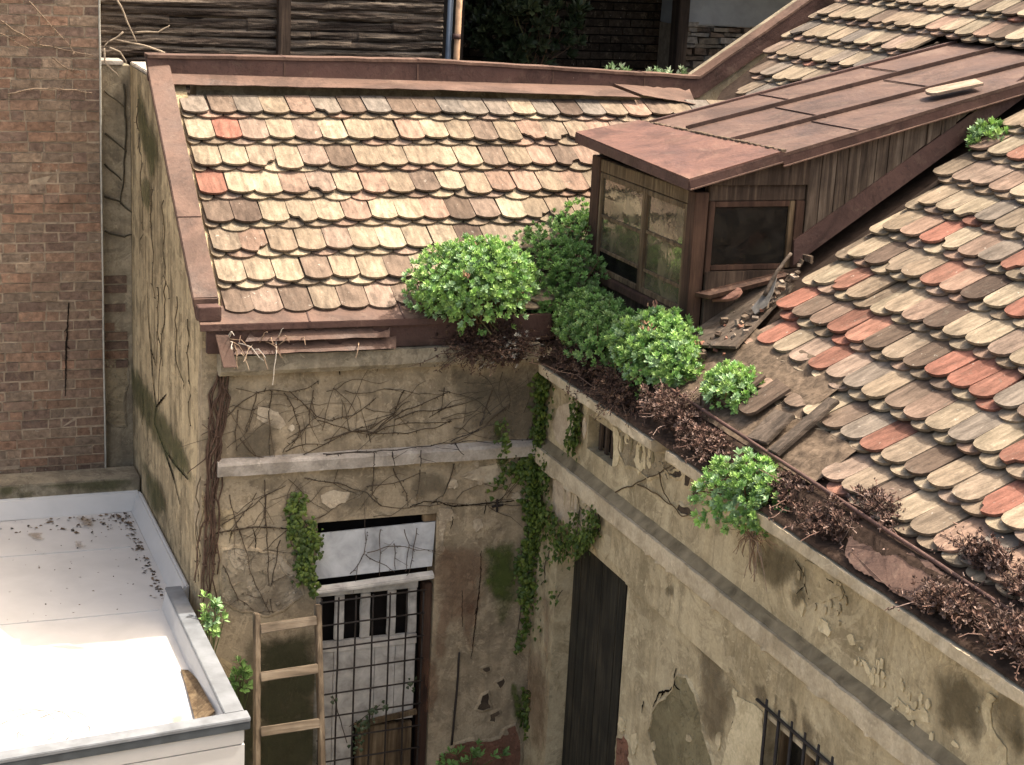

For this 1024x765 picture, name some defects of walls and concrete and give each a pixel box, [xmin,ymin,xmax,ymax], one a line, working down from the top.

crack [63,303,71,396]
spalling [612,427,703,521]
peeling [797,560,886,688]
spalling [436,664,524,765]
crack [642,669,680,708]
spalling [614,673,764,765]